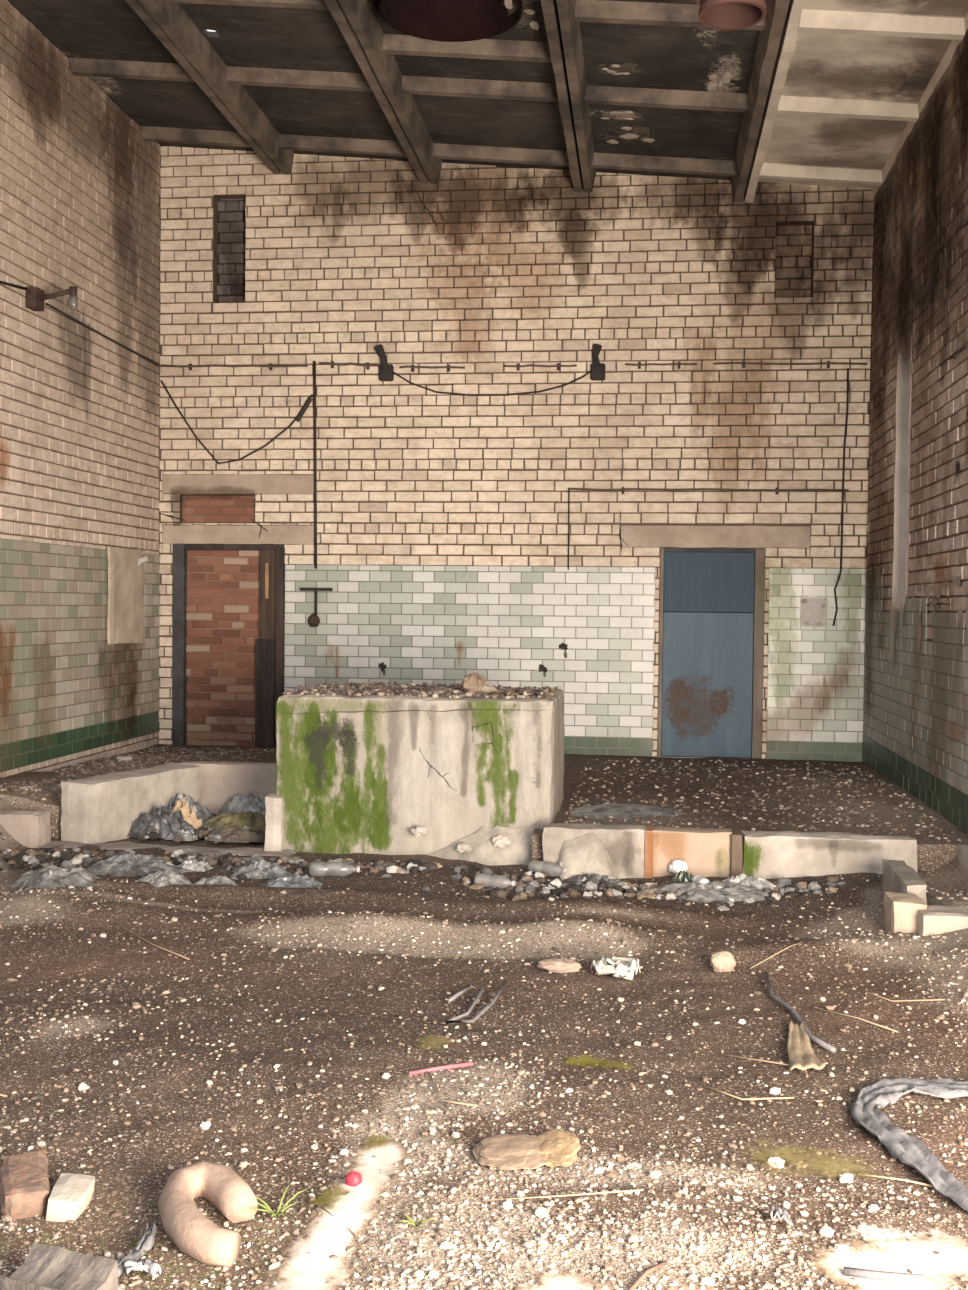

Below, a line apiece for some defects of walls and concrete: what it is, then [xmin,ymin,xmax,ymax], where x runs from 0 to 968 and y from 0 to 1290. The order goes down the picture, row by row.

water stain [304,702,488,850]
water stain [504,704,543,823]
rust [666,678,733,739]